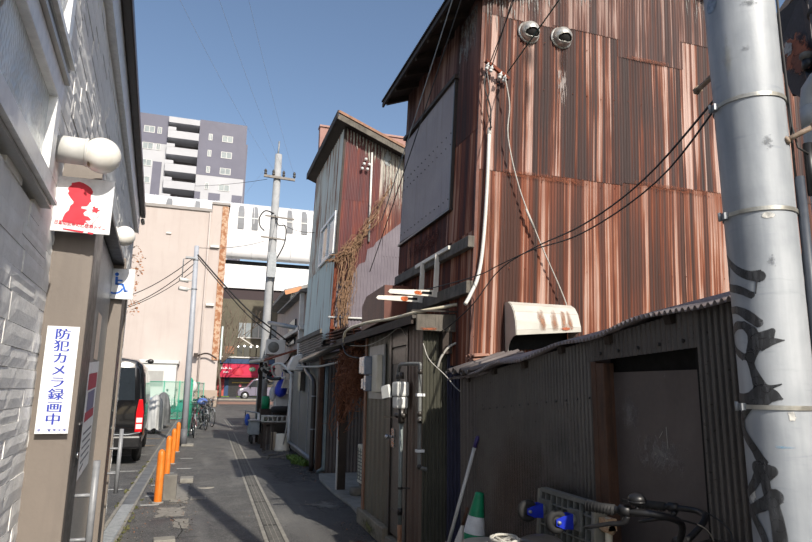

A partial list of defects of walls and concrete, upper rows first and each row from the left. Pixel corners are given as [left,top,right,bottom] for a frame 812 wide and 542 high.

rust [780,32,810,75]
rust [558,56,566,101]
rust [538,312,573,331]